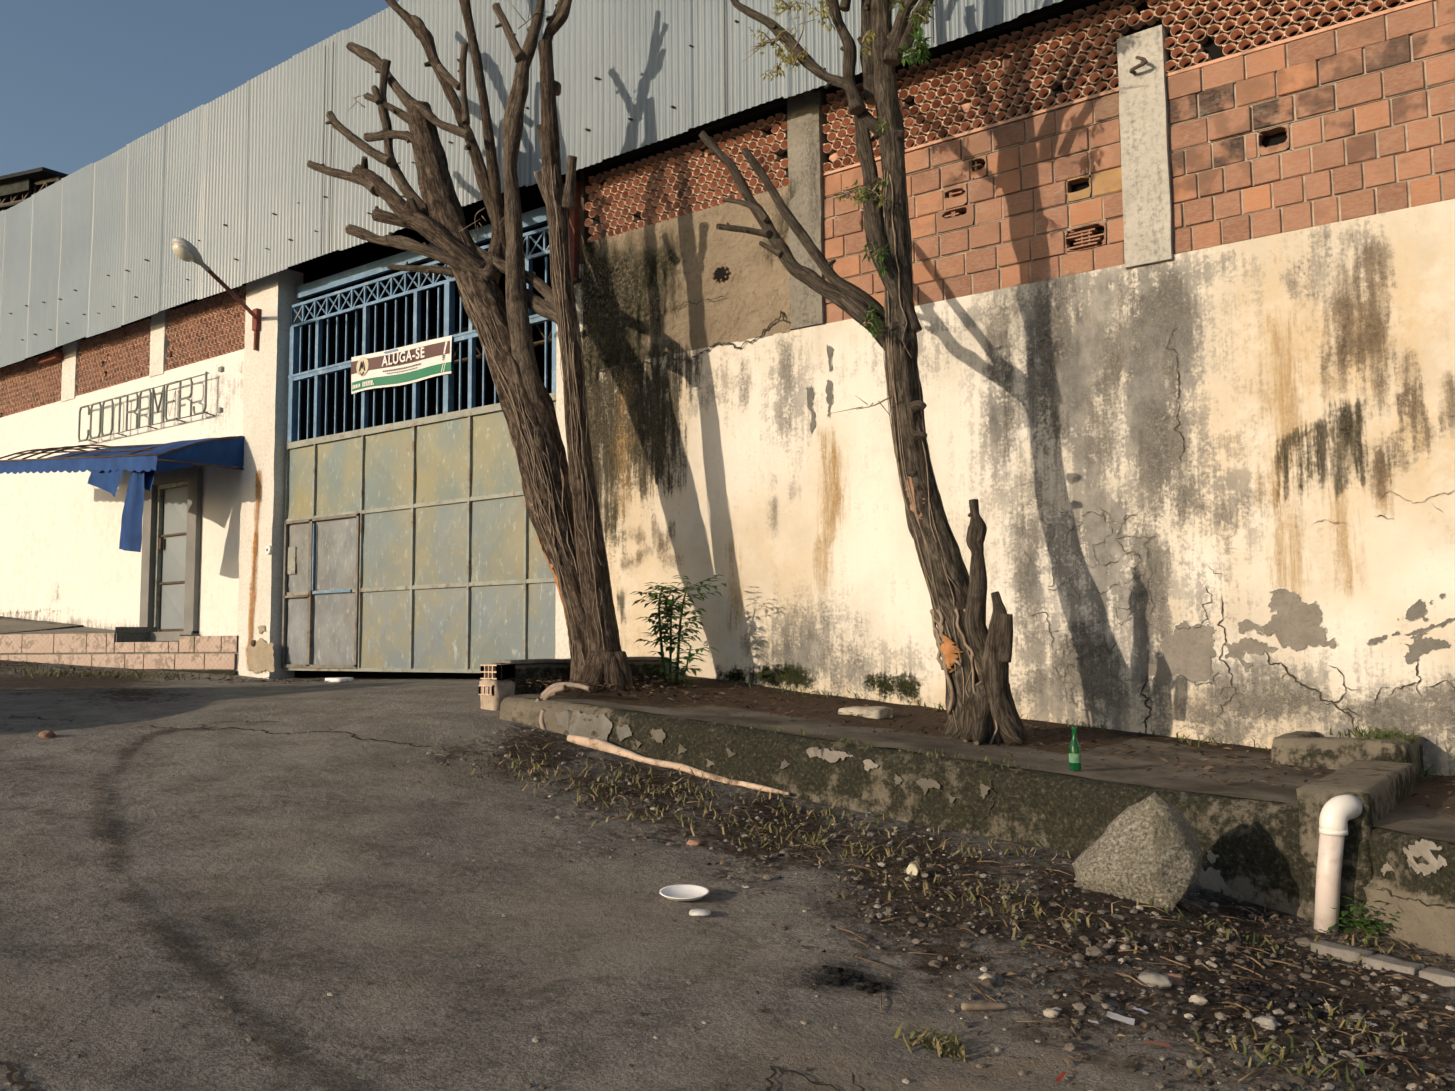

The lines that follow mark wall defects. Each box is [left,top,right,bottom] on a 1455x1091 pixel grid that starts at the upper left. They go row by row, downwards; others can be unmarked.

damp [573,232,700,536]
damp [1277,244,1455,498]
rust [245,472,260,669]
damp [617,592,625,620]
damp [621,522,676,568]
crack [1023,489,1455,734]
peeling [1147,587,1339,687]
peeling [1367,593,1455,664]
crack [138,721,429,747]
peeling [1381,839,1447,876]
crack [0,1061,36,1091]
crack [765,1066,866,1091]